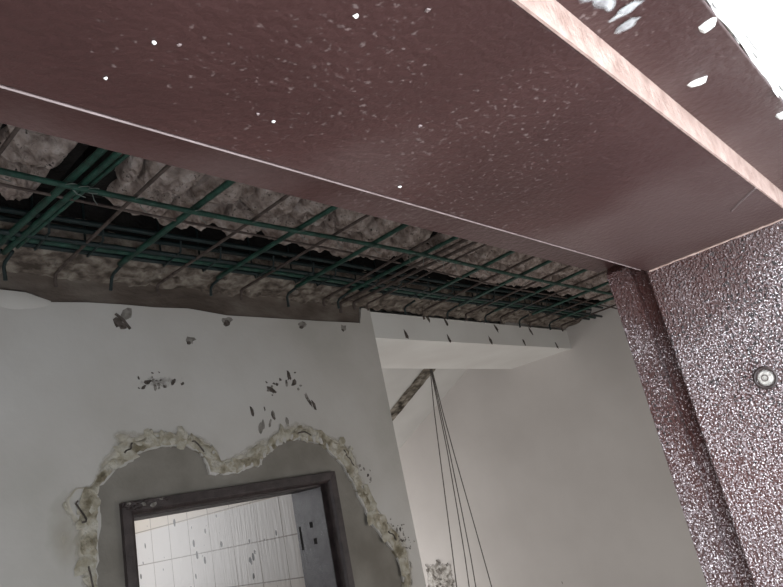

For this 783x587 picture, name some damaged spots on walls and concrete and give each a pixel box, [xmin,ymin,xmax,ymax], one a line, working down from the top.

peeling [0,123,617,332]
peeling [138,371,184,391]
peeling [265,371,317,410]
spalling [390,369,435,421]
flaking render [63,406,415,587]